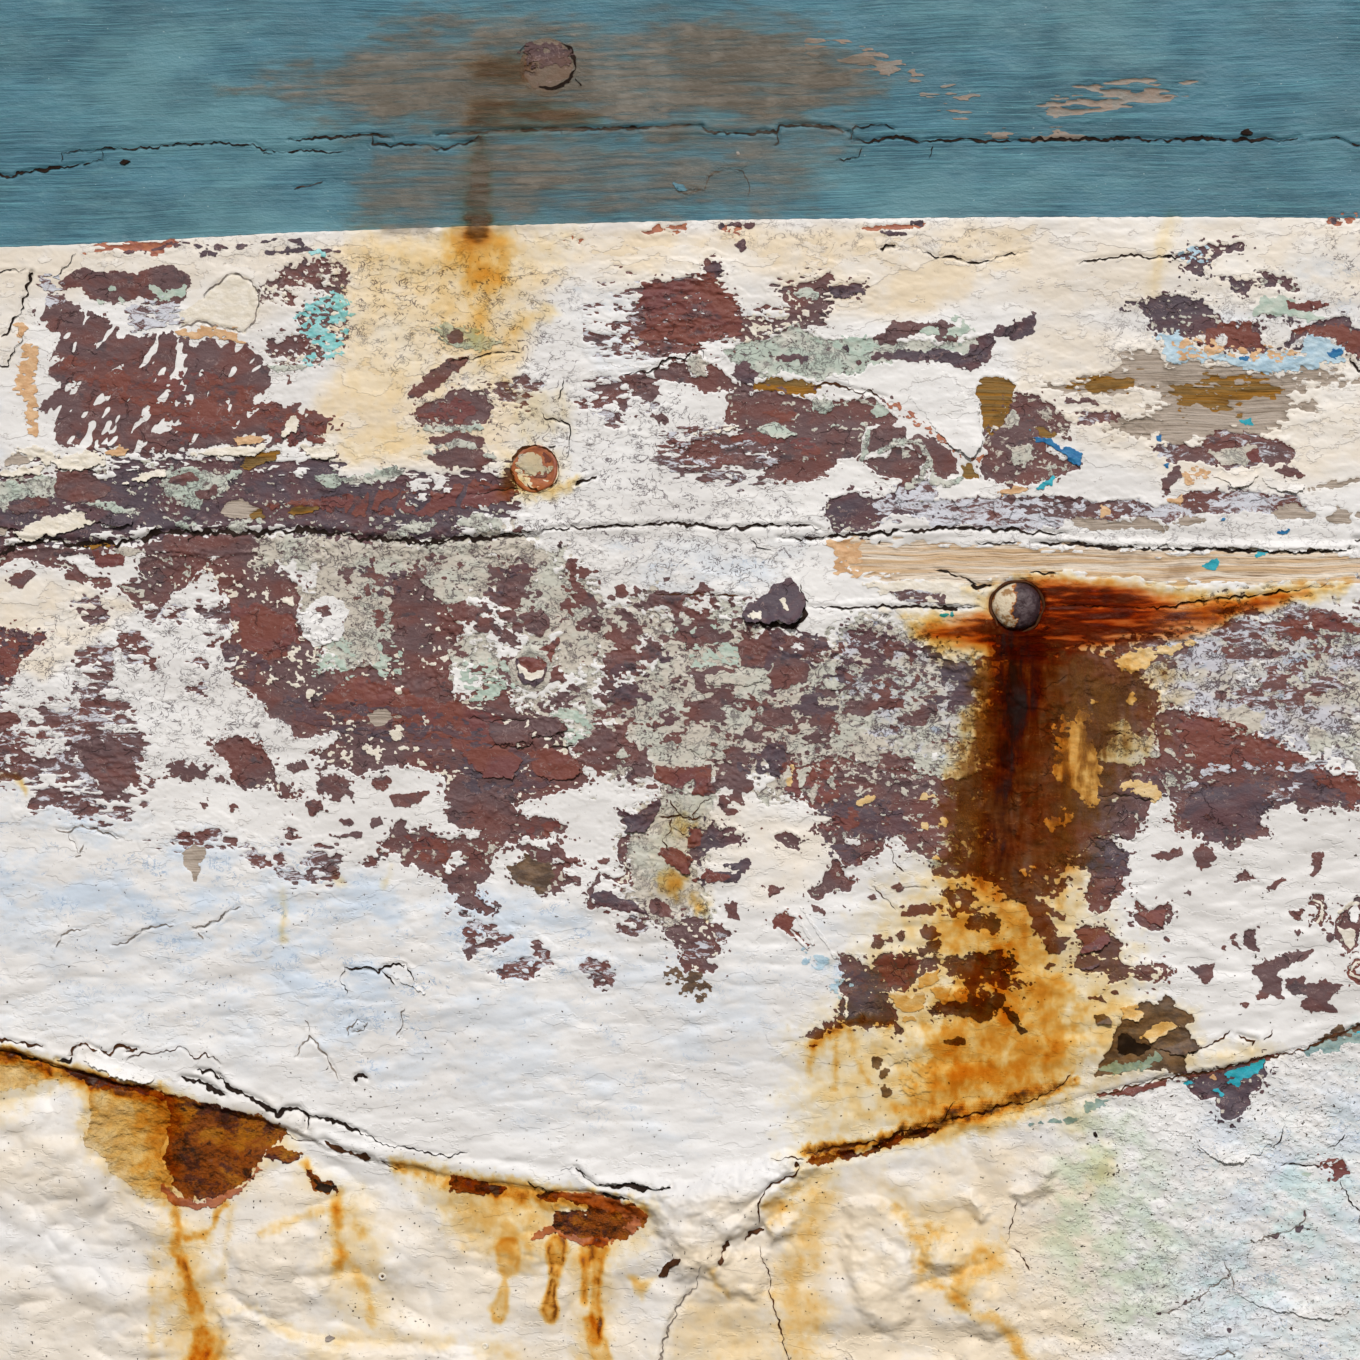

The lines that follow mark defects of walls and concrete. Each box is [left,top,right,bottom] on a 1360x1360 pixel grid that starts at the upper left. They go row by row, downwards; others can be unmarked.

leakage [284,16,879,212]
peeling [984,78,1198,142]
crack [0,124,1360,189]
peeling [718,222,755,252]
peeling [862,220,926,236]
crack [0,521,1360,611]
peeling [0,235,1360,1167]
corrosion [936,580,1272,870]
crack [0,1037,467,1170]
corrosion [900,1084,1059,1134]
corrosion [808,1142,856,1156]
crack [528,1168,671,1200]